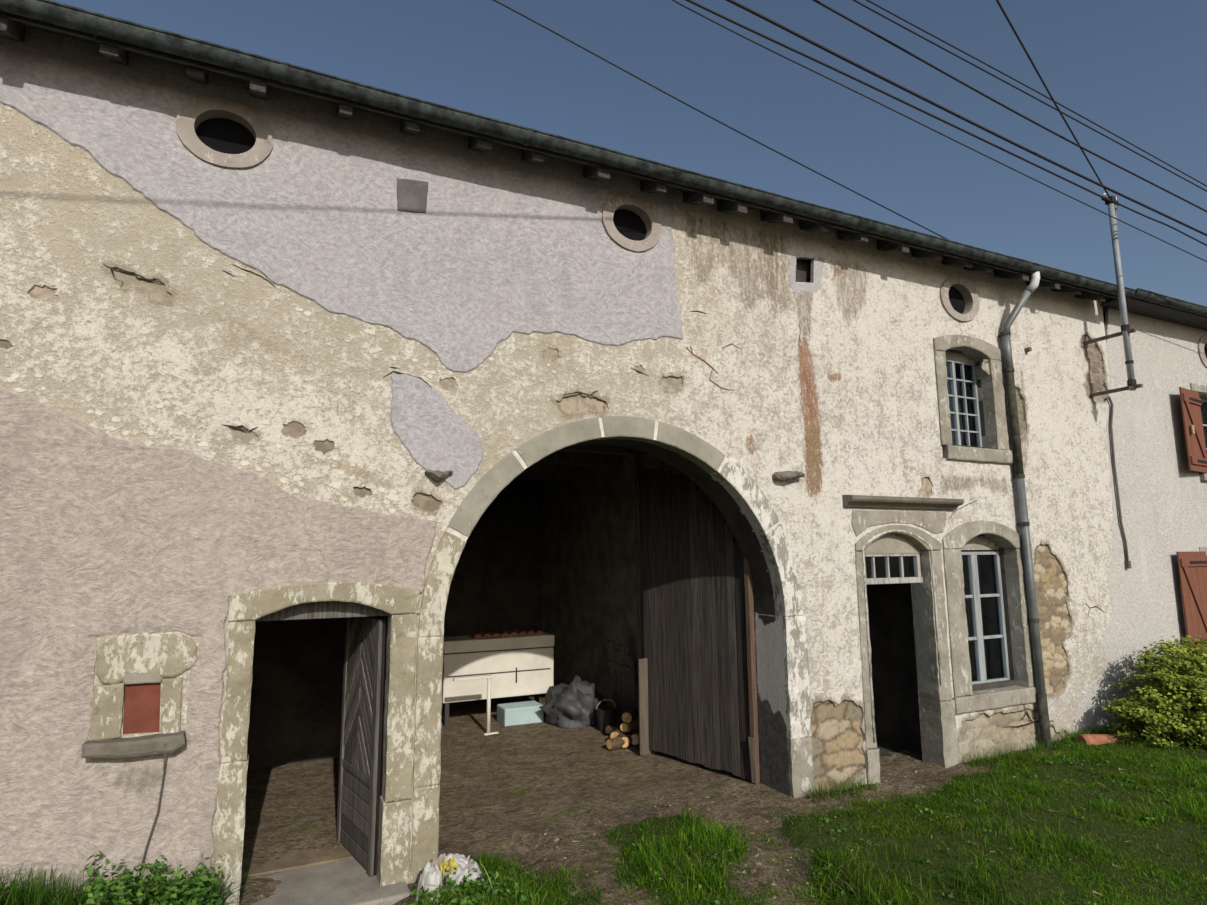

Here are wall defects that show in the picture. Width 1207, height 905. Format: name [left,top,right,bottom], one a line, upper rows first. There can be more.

spalling [104,262,175,306]
spalling [552,358,609,419]
corrosion [798,339,841,496]
spalling [1080,333,1110,405]
spalling [1033,540,1084,700]
peeling [755,612,788,737]
spalling [810,694,866,793]
spalling [957,704,1070,763]